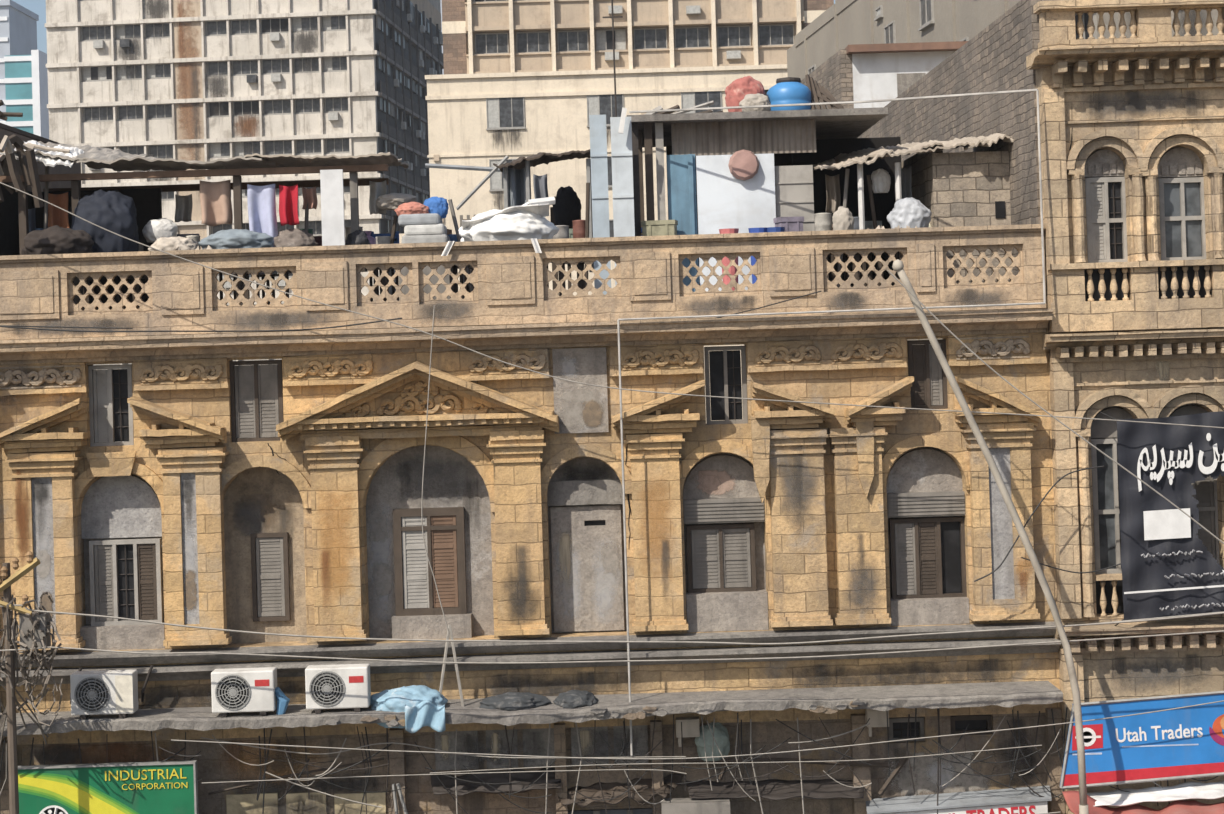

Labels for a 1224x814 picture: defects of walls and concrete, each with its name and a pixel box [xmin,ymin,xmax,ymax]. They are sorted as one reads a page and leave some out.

corrosion [179,6,198,161]
corrosion [17,473,27,549]
leakage [850,541,875,606]